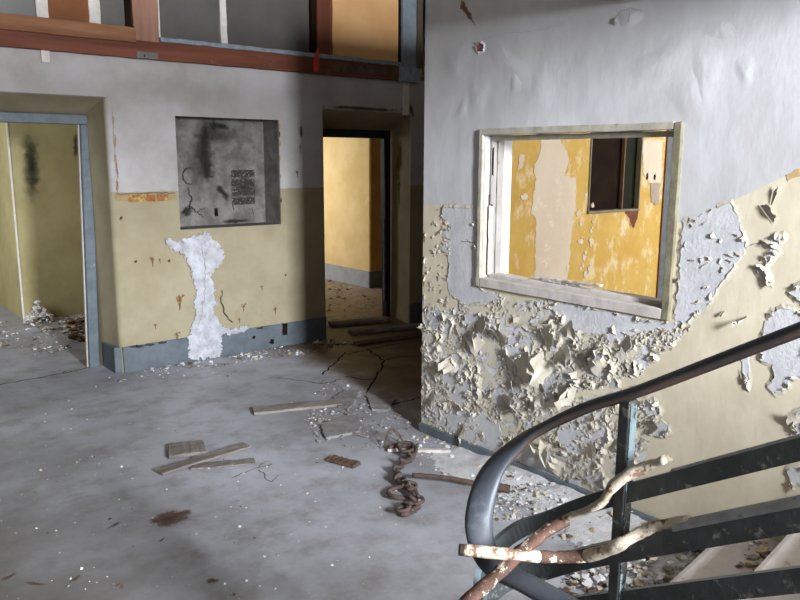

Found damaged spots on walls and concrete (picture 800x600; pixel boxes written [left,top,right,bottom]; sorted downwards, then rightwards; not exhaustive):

leakage [25,143,38,189]
flaking render [111,106,177,204]
flaking render [520,139,594,282]
peeling [752,186,789,288]
peeling [417,199,750,452]
peeling [758,281,800,338]
crack [292,341,416,393]
peeling [740,338,800,398]
peeling [526,404,619,492]
peeling [634,395,673,465]
peeling [786,407,800,435]